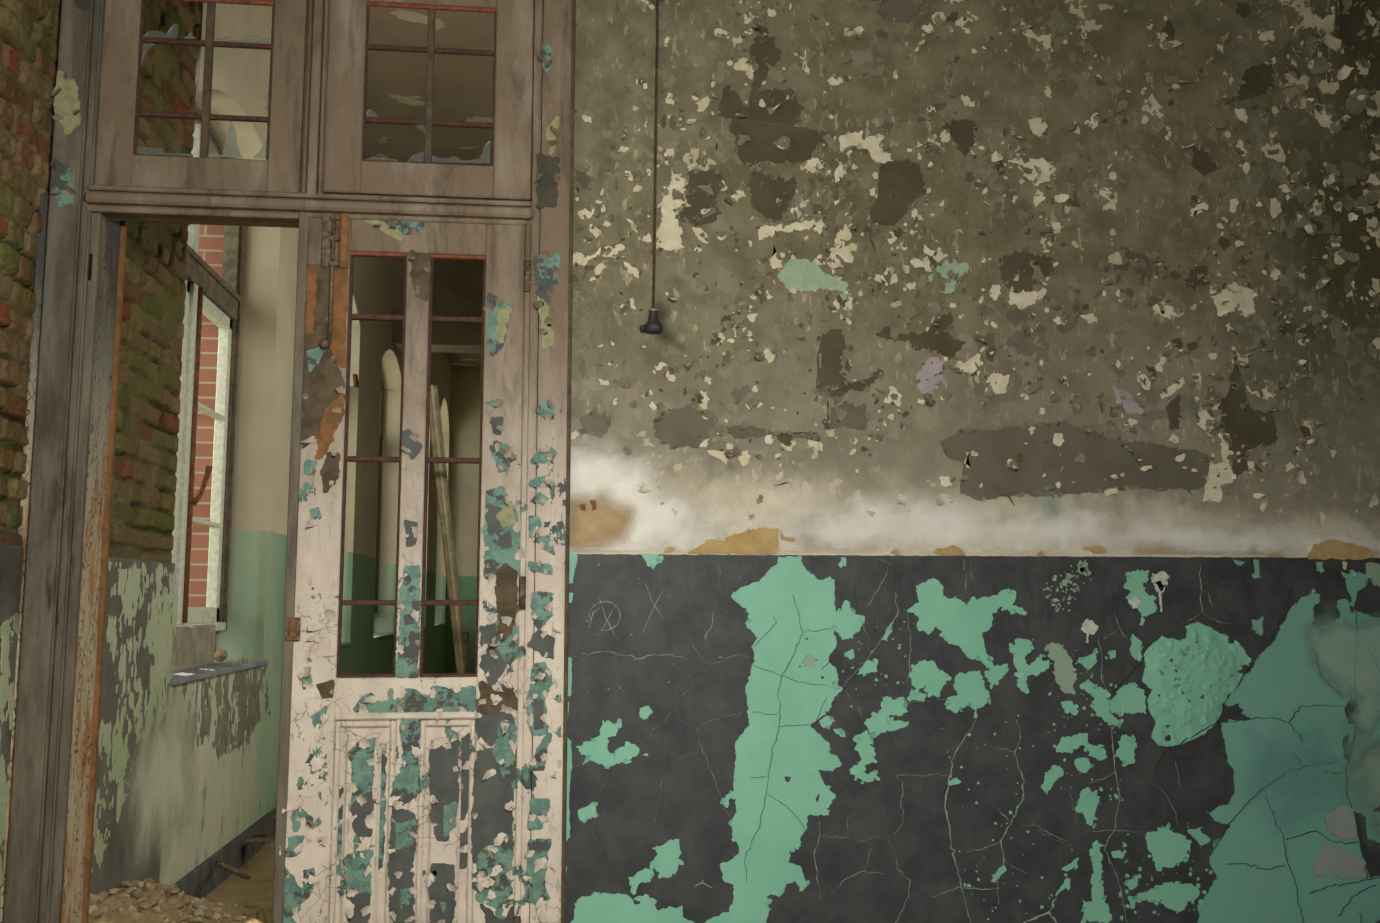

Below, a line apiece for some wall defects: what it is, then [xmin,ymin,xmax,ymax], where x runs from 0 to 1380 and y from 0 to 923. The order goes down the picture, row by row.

peeling [301,263,349,520]
peeling [486,292,512,356]
damp [570,448,720,551]
peeling [533,0,1380,516]
damp [778,501,1380,553]
peeling [91,559,271,873]
peeling [283,808,315,923]
peeling [301,674,335,724]
peeling [336,399,648,923]
peeling [570,495,1380,923]
crack [573,558,1380,923]
damp [1307,619,1380,834]